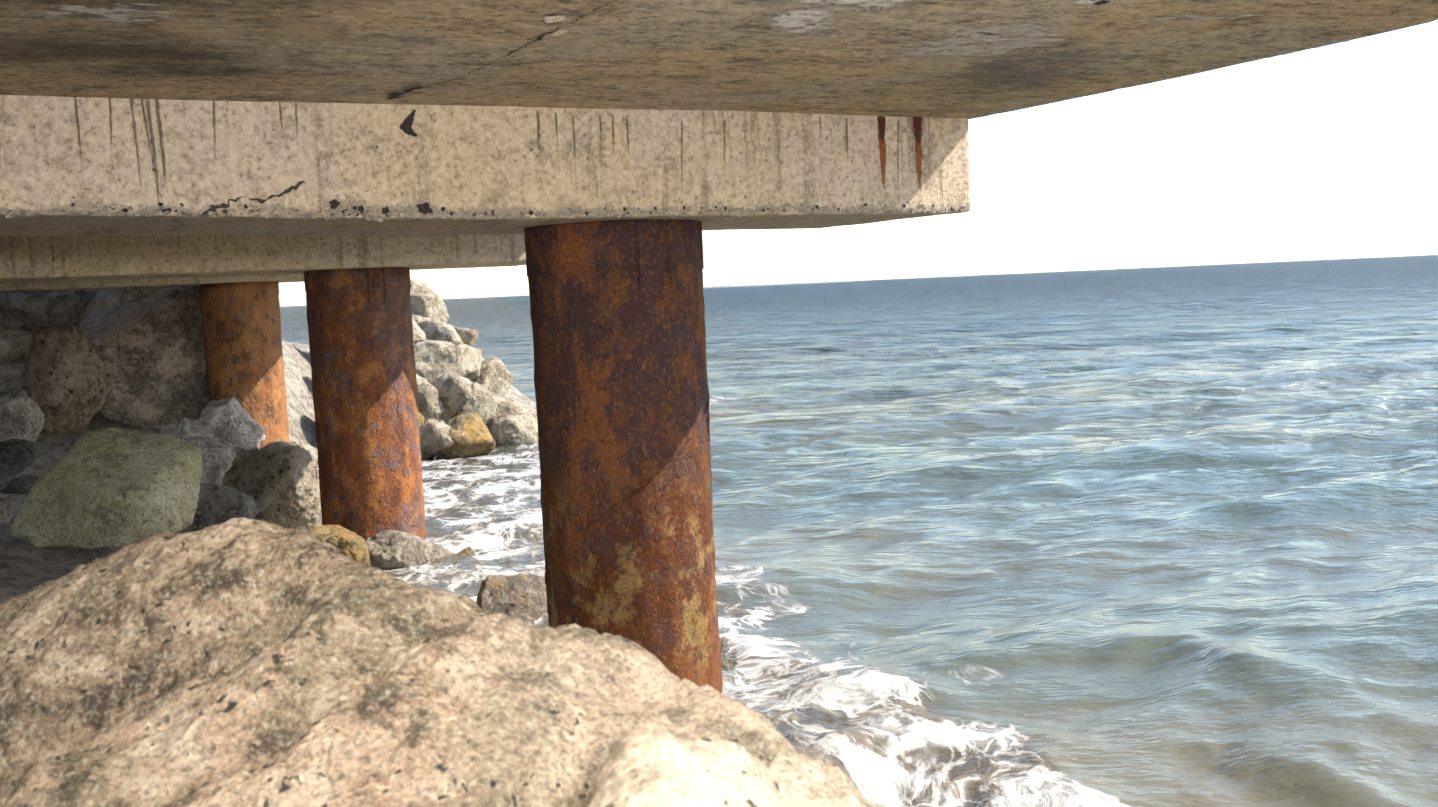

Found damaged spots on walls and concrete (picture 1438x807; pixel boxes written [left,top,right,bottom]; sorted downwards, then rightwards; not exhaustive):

leakage [11,0,206,28]
leakage [0,39,247,73]
crack [423,0,618,88]
leakage [753,0,910,34]
rust [877,116,886,189]
rust [913,117,923,190]